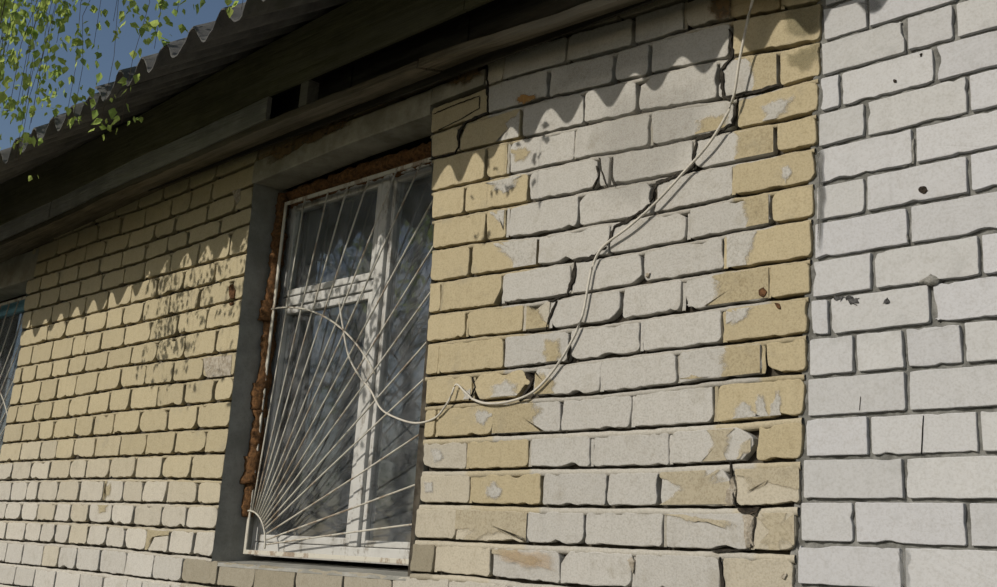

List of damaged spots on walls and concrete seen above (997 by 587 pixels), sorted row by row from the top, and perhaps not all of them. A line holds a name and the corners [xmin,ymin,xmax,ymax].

peeling [745,52,776,90]
crack [429,65,490,160]
peeling [496,110,530,161]
peeling [695,97,792,159]
crack [545,29,780,331]
peeling [493,238,537,268]
peeling [704,194,769,324]
peeling [475,372,554,433]
crack [519,374,535,401]
peeling [721,344,760,377]
peeling [660,394,799,550]
crack [711,461,760,587]